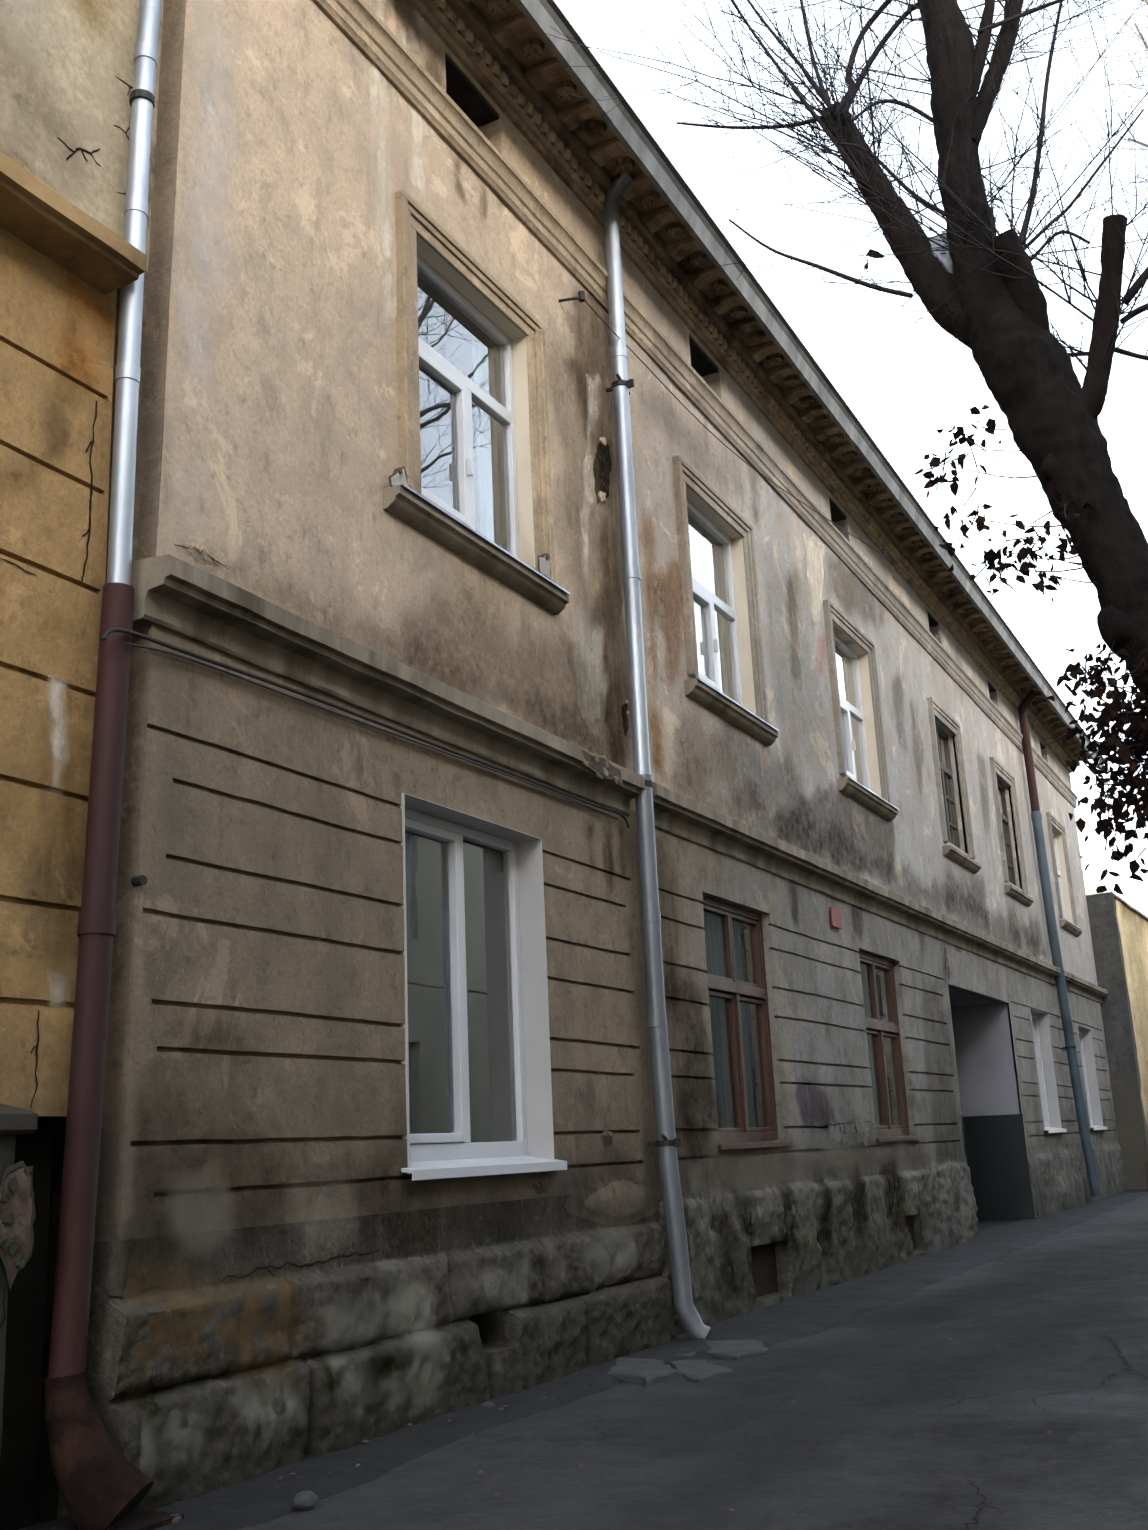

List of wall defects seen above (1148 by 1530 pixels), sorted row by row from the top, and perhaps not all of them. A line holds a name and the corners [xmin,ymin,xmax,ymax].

leakage [579,309,610,414]
crack [82,400,97,585]
crack [0,558,37,576]
leakage [51,679,62,758]
crack [30,1010,39,1108]